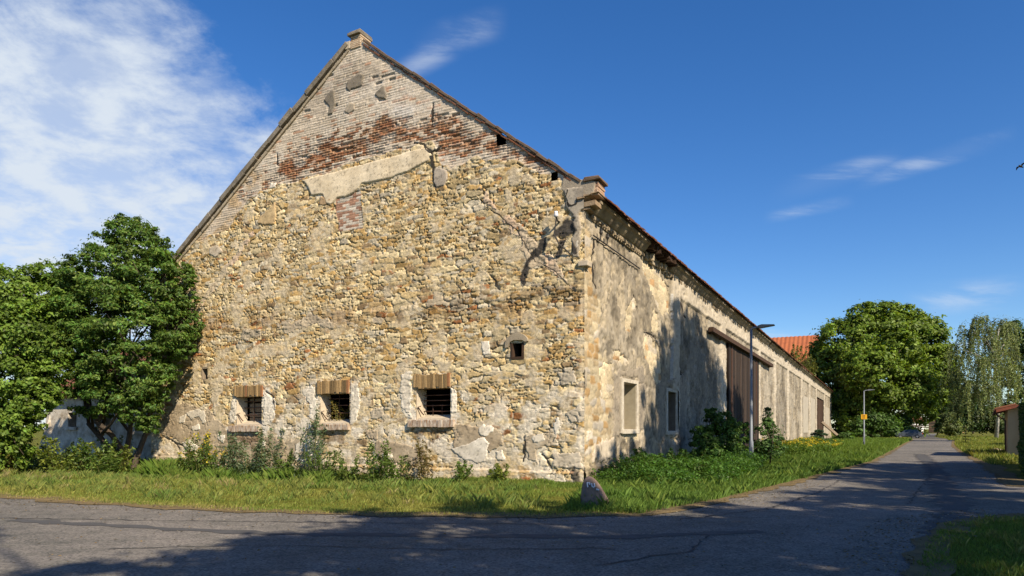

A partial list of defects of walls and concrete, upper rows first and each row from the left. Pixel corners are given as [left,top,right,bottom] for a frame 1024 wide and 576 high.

flaking render [451,388,506,463]
flaking render [523,251,697,469]